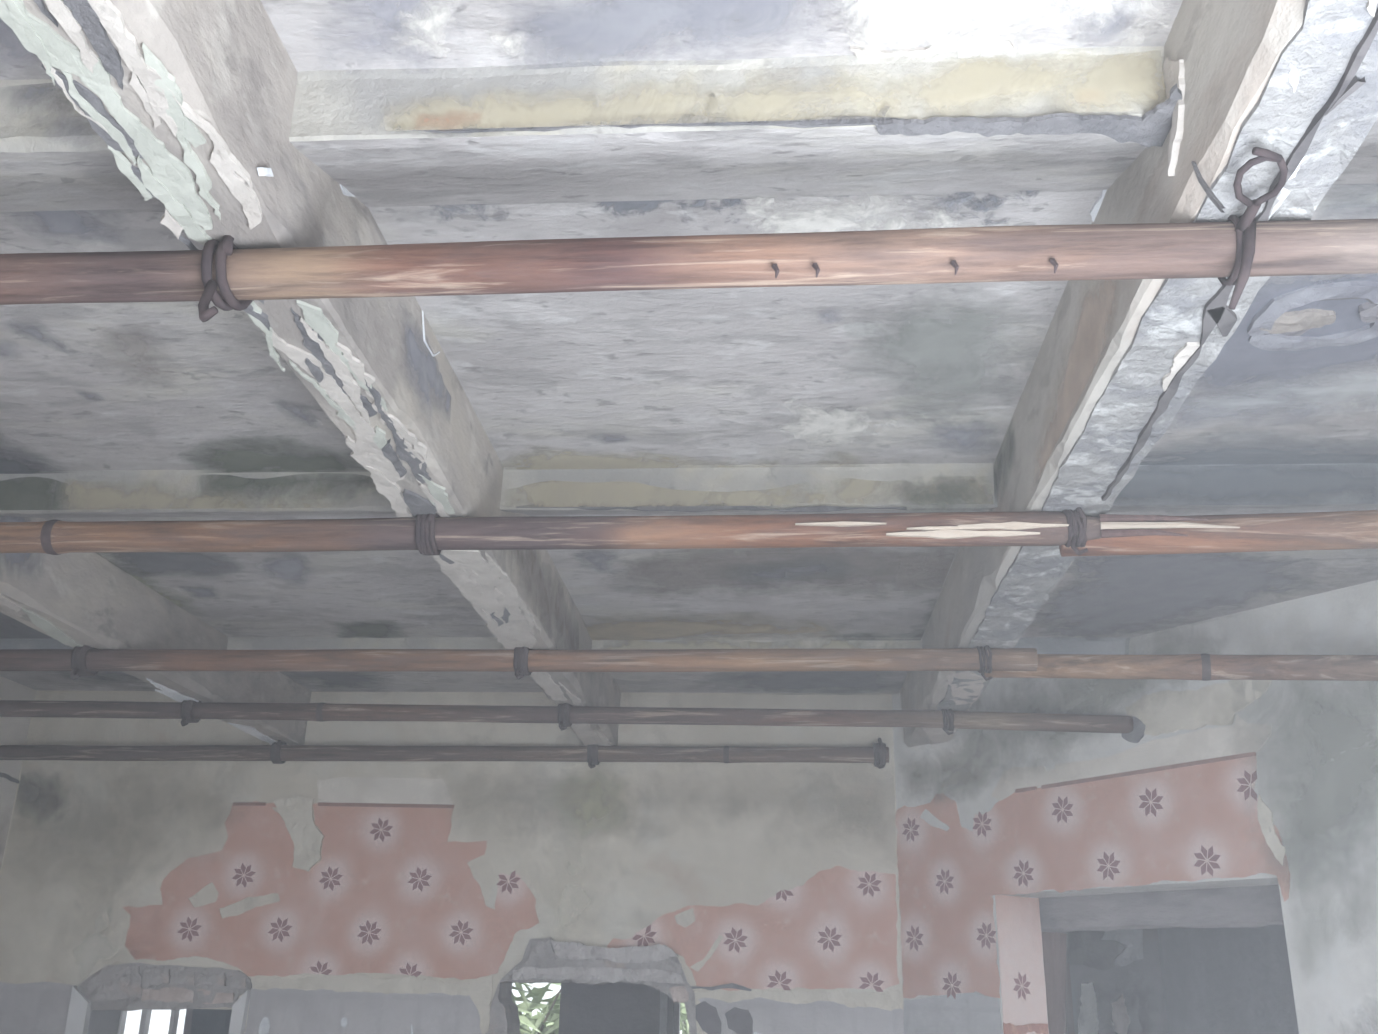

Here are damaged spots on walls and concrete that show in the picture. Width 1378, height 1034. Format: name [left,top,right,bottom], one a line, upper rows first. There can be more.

peeling [0,0,274,250]
damp [400,88,895,130]
damp [919,56,1156,108]
peeling [244,300,455,518]
peeling [0,982,75,1034]
peeling [245,937,1003,1034]